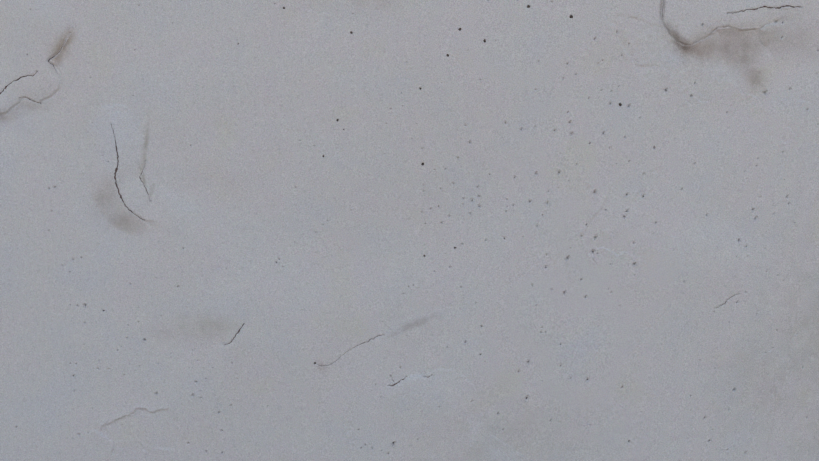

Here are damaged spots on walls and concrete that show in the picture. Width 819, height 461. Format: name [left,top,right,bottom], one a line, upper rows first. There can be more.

spalling [591,0,819,159]
crack [224,323,245,346]
crack [316,334,384,368]